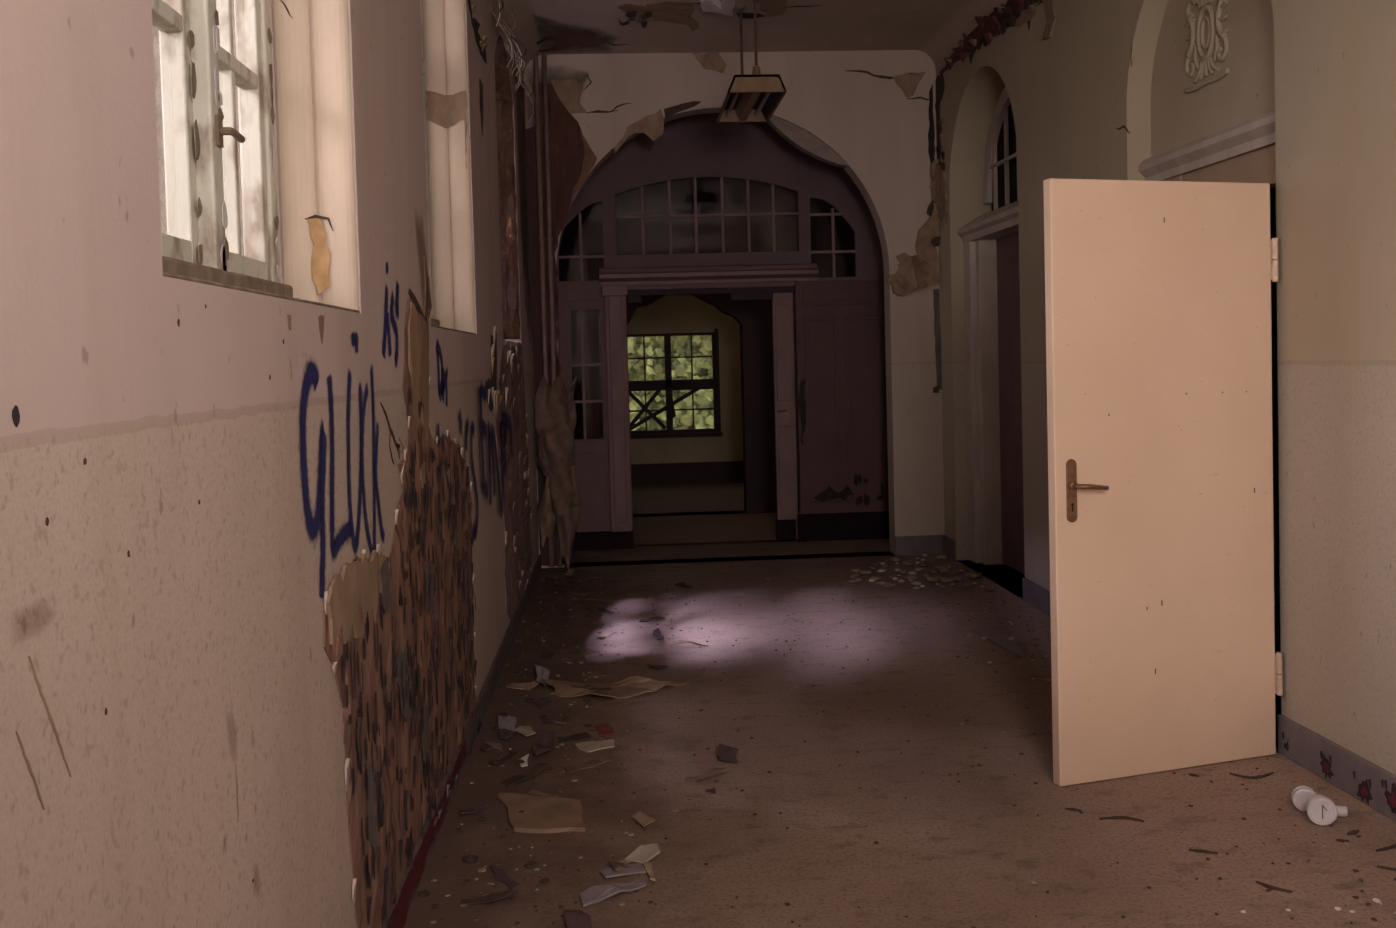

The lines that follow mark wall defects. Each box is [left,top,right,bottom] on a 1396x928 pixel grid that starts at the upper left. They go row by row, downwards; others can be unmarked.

spalling [617,4,652,28]
crack [845,70,929,100]
spalling [614,101,702,154]
peeling [887,0,1029,297]
peeling [307,219,330,294]
peeling [464,0,597,620]
peeling [323,256,482,928]